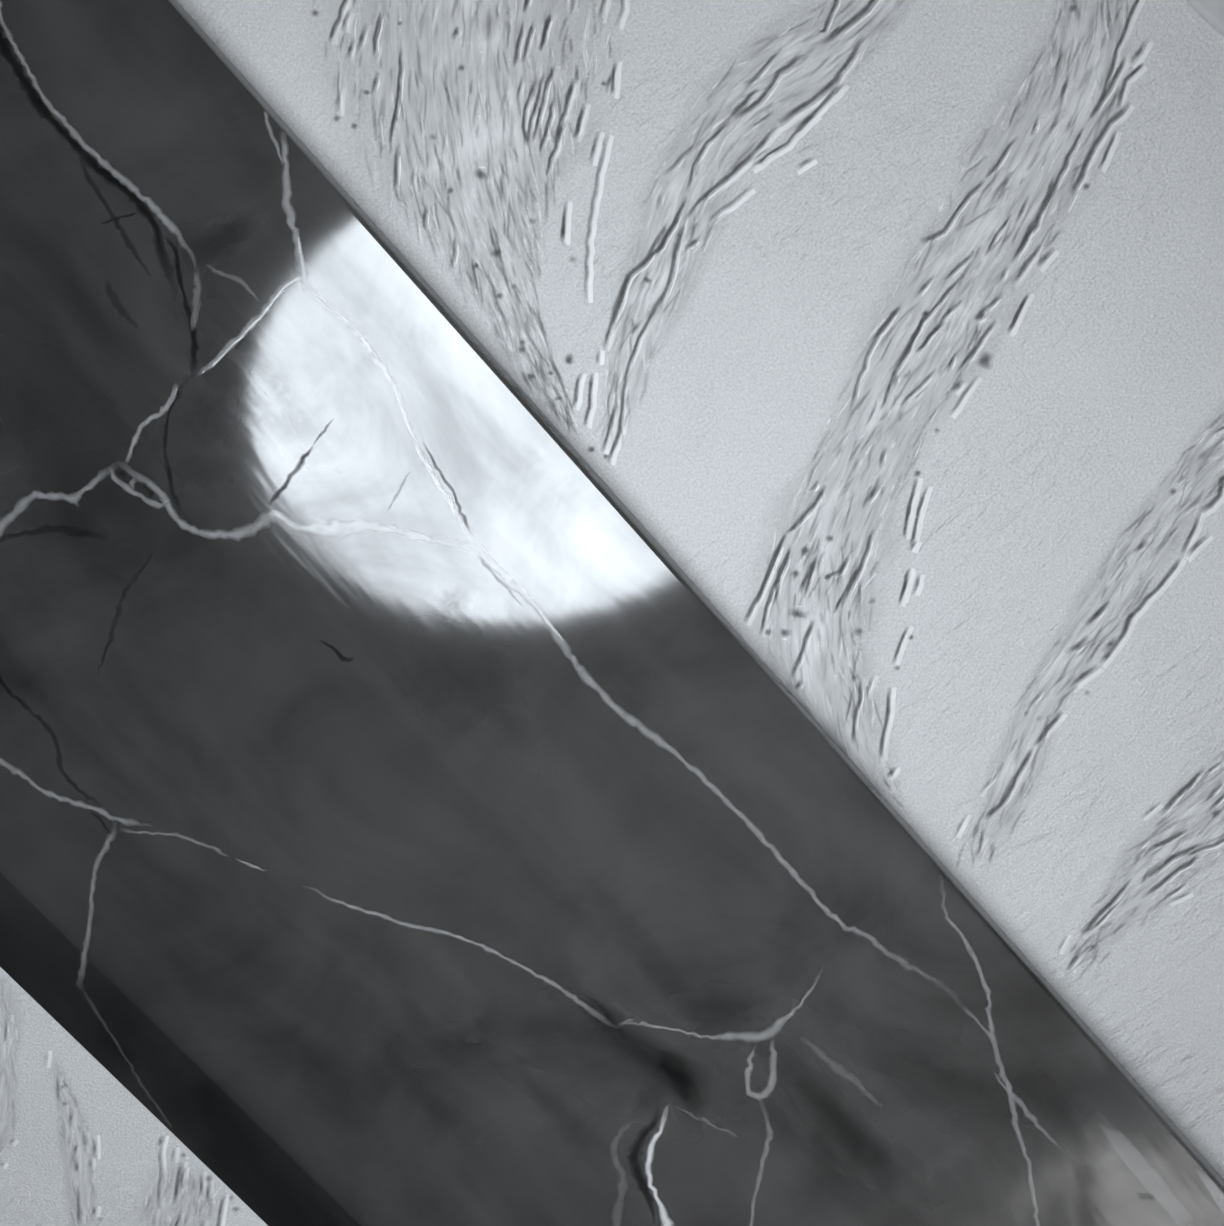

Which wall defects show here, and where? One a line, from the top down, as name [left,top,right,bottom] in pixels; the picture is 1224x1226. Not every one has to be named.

crack [0,14,299,364]
crack [272,452,309,525]
crack [420,453,468,533]
crack [653,1000,804,1098]
crack [631,1125,671,1226]